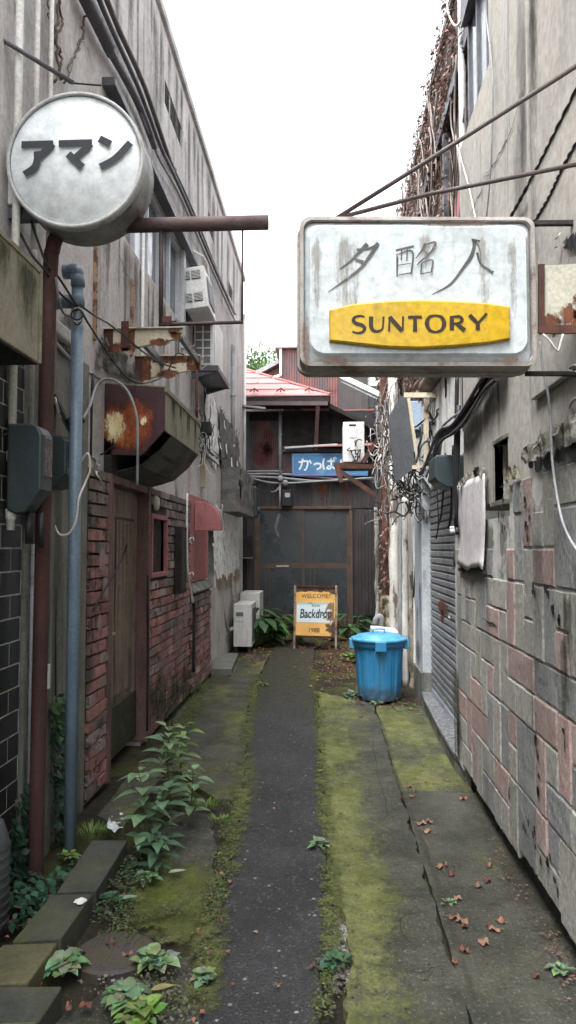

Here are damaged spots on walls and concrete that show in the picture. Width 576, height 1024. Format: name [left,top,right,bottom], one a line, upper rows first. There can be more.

rust [104,329,201,381]
rust [104,396,154,454]
flaking render [498,408,576,534]
peeling [212,504,240,580]